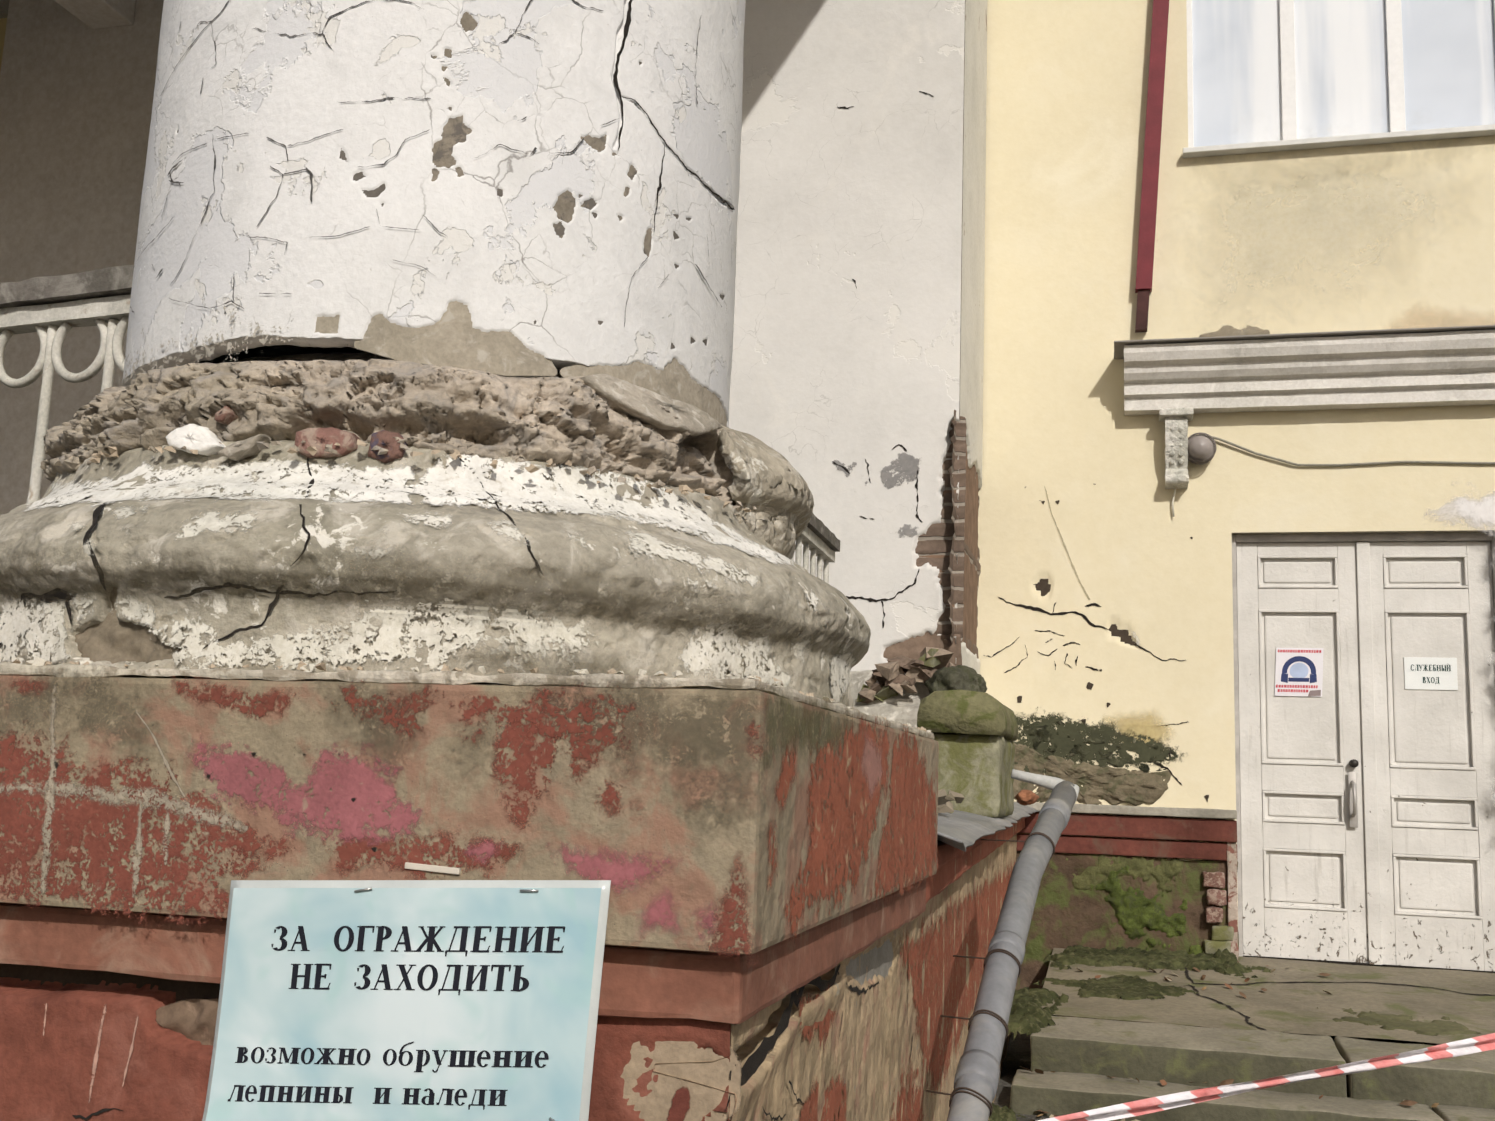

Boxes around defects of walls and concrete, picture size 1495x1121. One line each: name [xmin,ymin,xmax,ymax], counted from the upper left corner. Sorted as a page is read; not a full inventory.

crack [130,97,445,312]
crack [476,0,735,327]
crack [164,458,397,649]
spalling [22,301,798,595]
peeling [833,452,920,489]
crack [846,570,919,627]
spalling [883,410,981,668]
crack [984,489,1185,673]
peeling [0,586,642,934]
peeling [562,846,672,892]
spalling [620,1041,741,1121]
crack [725,964,913,1121]